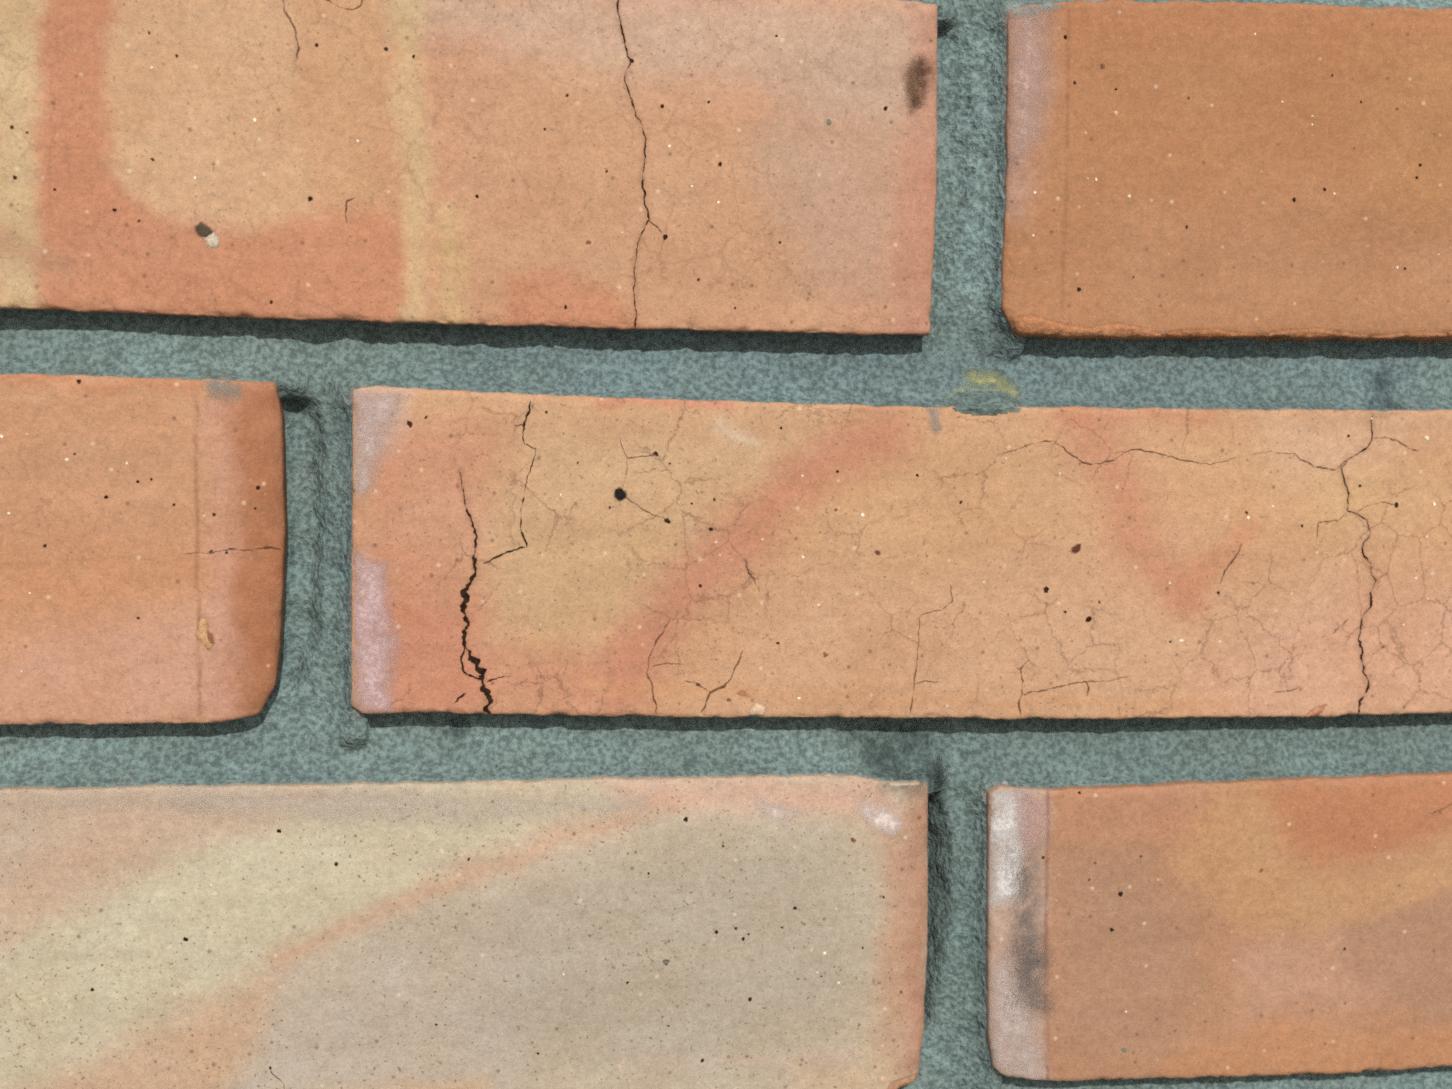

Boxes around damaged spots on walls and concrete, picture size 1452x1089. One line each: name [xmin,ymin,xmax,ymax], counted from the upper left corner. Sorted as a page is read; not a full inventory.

crack [616,0,660,328]
crack [620,439,663,518]
crack [454,402,536,714]
crack [1003,415,1418,715]
crack [646,620,743,715]
crack [910,584,953,712]
efflorescence [990,791,1043,901]
efflorescence [991,969,1036,1078]